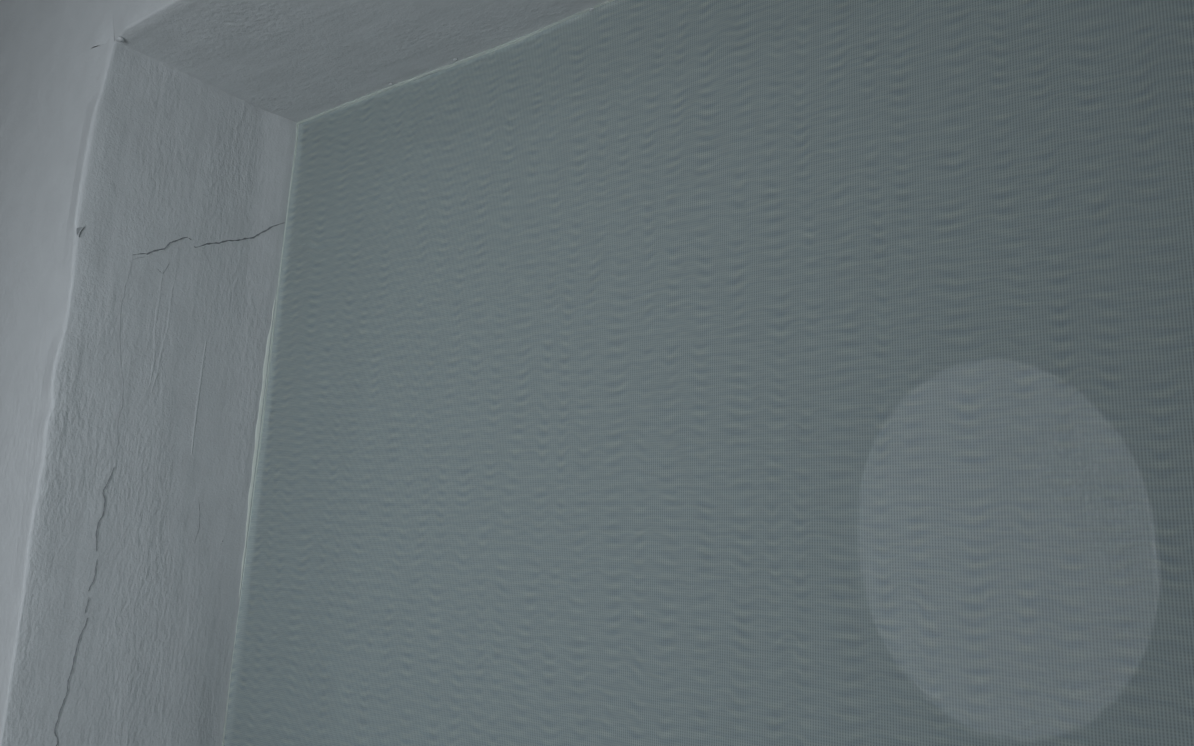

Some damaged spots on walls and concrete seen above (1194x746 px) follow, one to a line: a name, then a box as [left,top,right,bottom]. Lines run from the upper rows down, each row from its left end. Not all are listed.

crack [54,222,285,746]